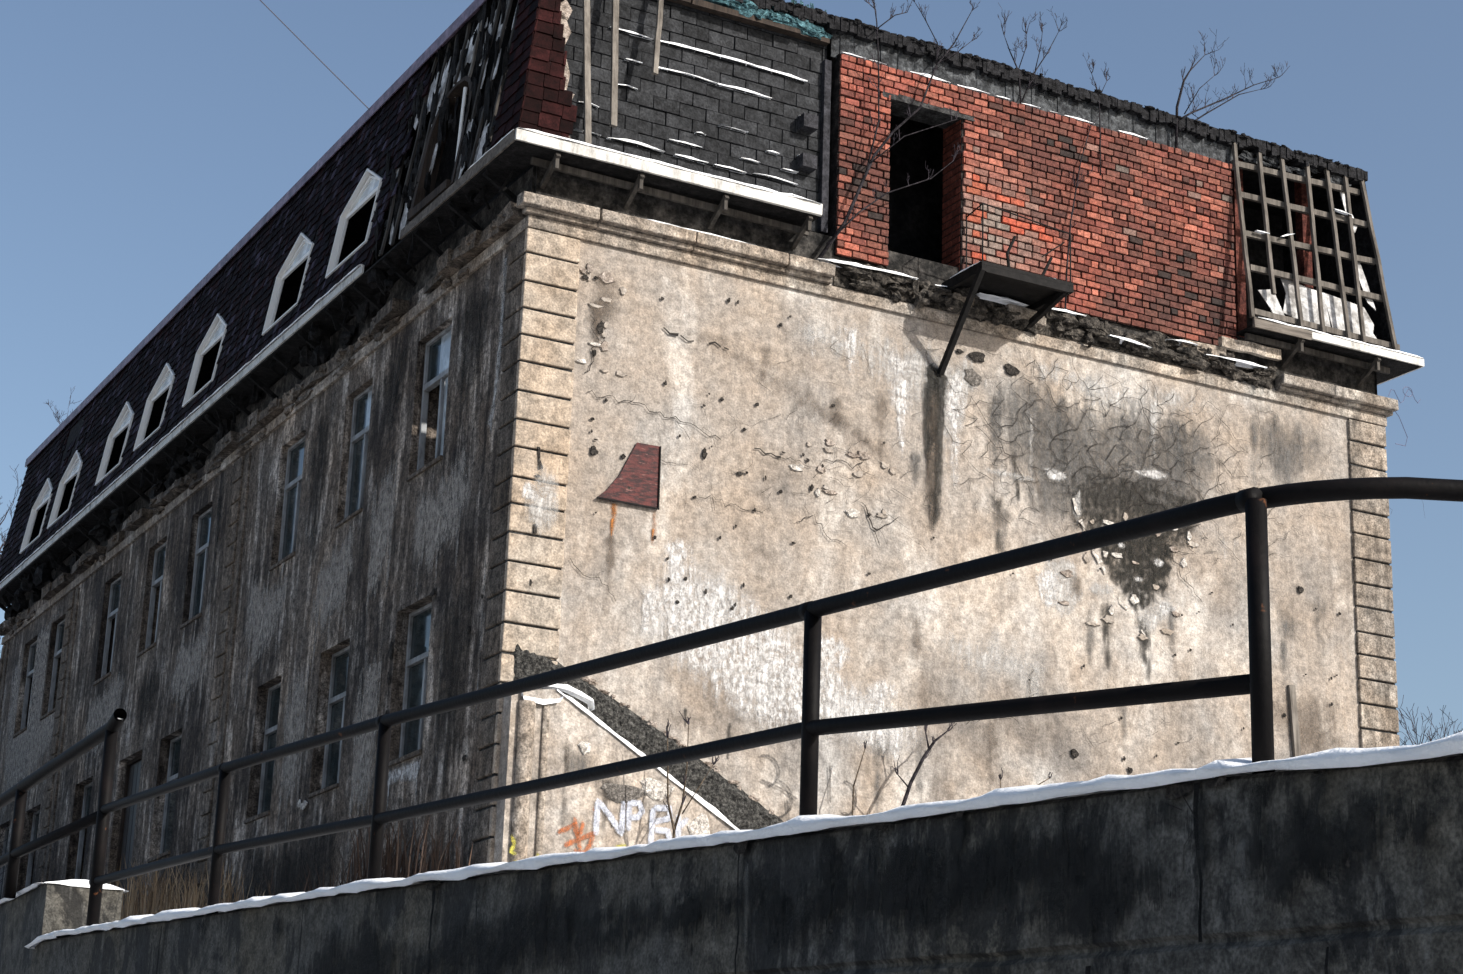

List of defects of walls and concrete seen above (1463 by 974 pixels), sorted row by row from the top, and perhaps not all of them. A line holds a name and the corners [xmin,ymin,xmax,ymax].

water stain [814,330,973,525]
crack [584,316,1352,600]
flaking render [957,349,986,387]
flaking render [1004,363,1020,376]
peeling [1005,304,1046,328]
water stain [991,365,1211,550]
peeling [1179,336,1282,362]
water stain [1089,604,1111,668]
water stain [1102,525,1192,676]
water stain [244,834,333,948]
water stain [303,805,1176,974]
water stain [1225,774,1441,906]